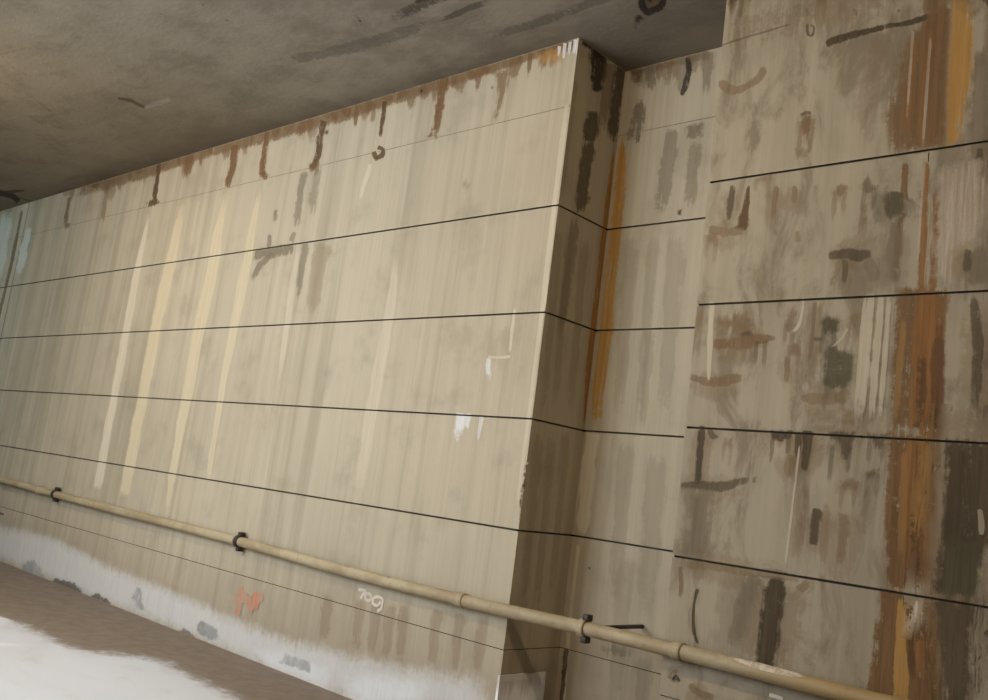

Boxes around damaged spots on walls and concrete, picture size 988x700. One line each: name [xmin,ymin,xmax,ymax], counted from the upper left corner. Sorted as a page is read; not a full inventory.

corrosion [144,163,162,208]
corrosion [257,131,270,181]
corrosion [292,120,329,231]
corrosion [369,101,388,161]
corrosion [426,77,450,140]
corrosion [491,44,568,125]
damp [0,210,32,293]
damp [62,0,911,618]
corrosion [576,136,628,536]
damp [599,0,988,700]
corrosion [861,0,977,700]
damp [0,520,495,700]